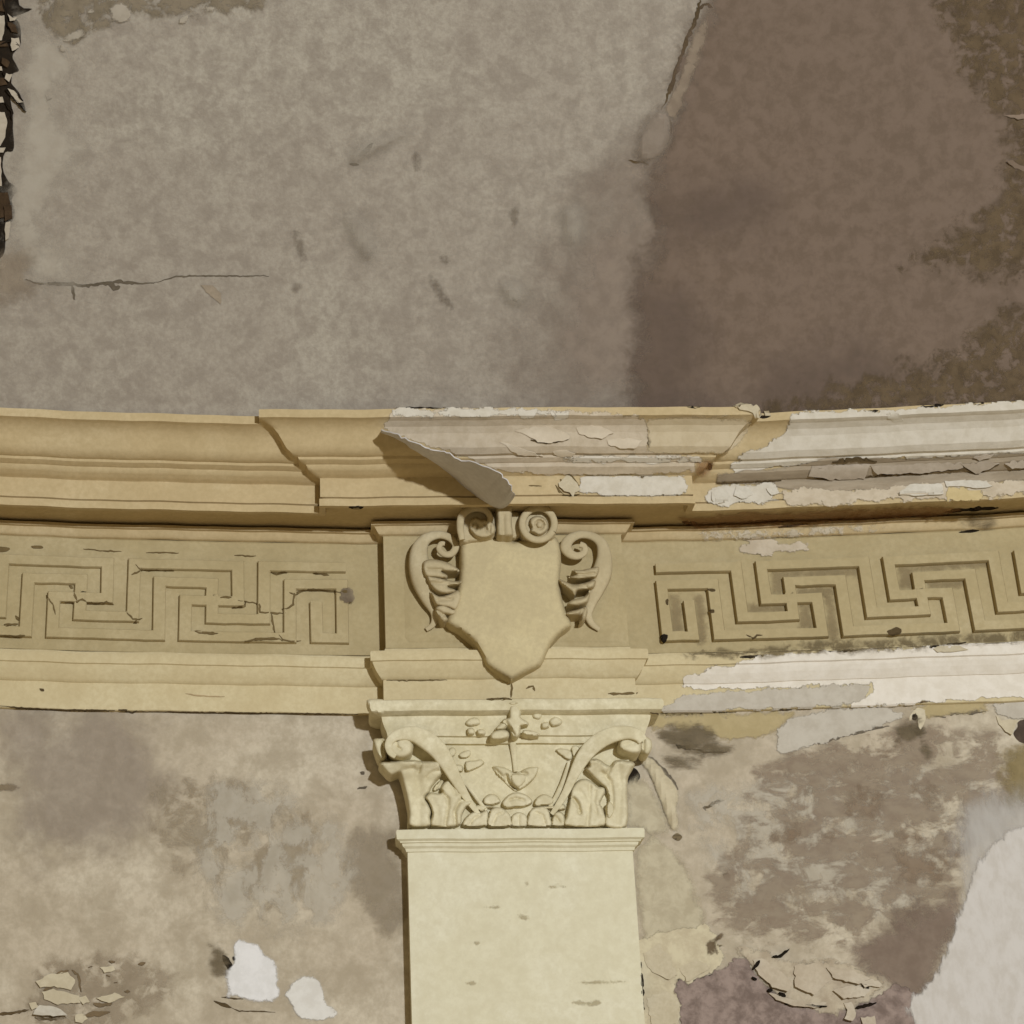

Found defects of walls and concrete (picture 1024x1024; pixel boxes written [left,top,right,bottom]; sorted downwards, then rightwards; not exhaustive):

crack [661,0,711,109]
peeling [0,0,264,279]
leakage [560,0,1024,413]
crack [25,275,269,300]
peeling [381,400,1024,509]
crack [46,585,142,624]
crack [84,549,178,575]
crack [220,555,347,642]
leakage [659,727,731,767]
peeling [639,627,1024,1024]
leakage [689,746,1024,995]
peeling [29,954,168,1024]